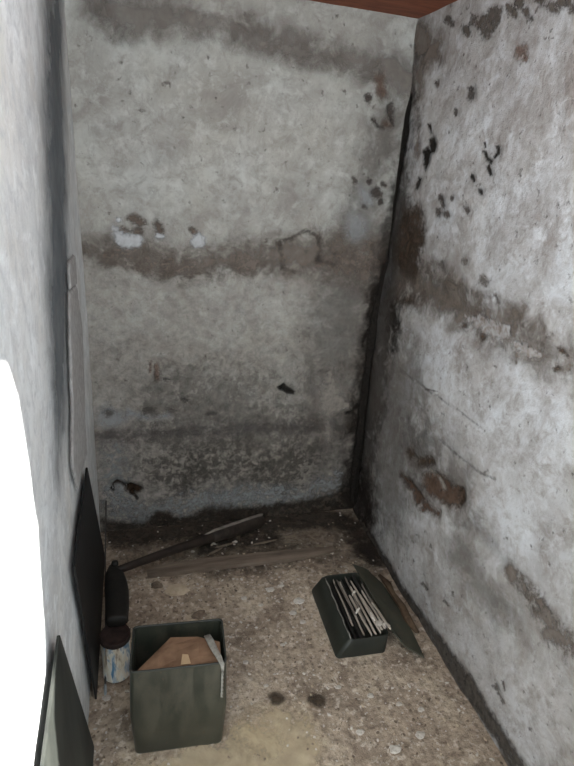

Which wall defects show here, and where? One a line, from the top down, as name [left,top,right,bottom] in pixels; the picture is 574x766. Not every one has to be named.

damp [444,0,533,40]
damp [535,0,574,13]
damp [87,0,444,111]
peeling [112,214,165,248]
peeling [188,226,205,248]
crack [345,94,412,507]
damp [82,115,557,766]
spalling [400,450,465,517]
damp [504,564,574,657]